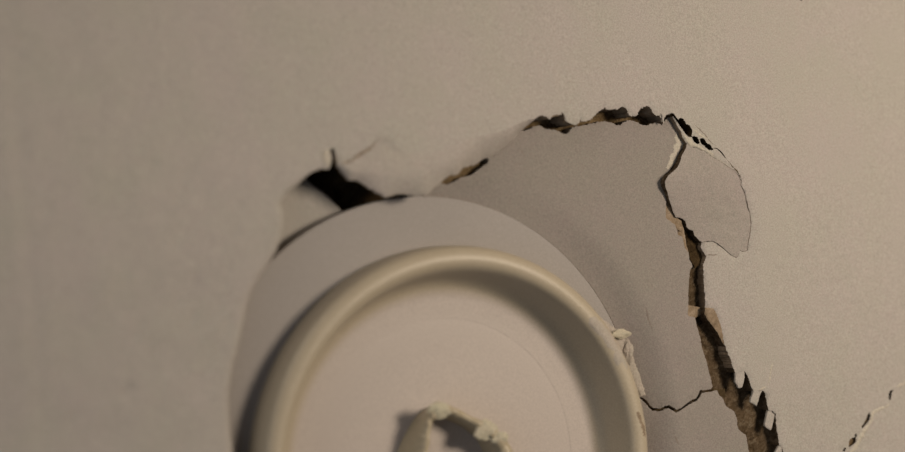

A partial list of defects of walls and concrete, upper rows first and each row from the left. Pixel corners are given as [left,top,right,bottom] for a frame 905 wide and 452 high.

peeling [660,143,751,258]
crack [640,202,782,452]
crack [849,382,905,452]